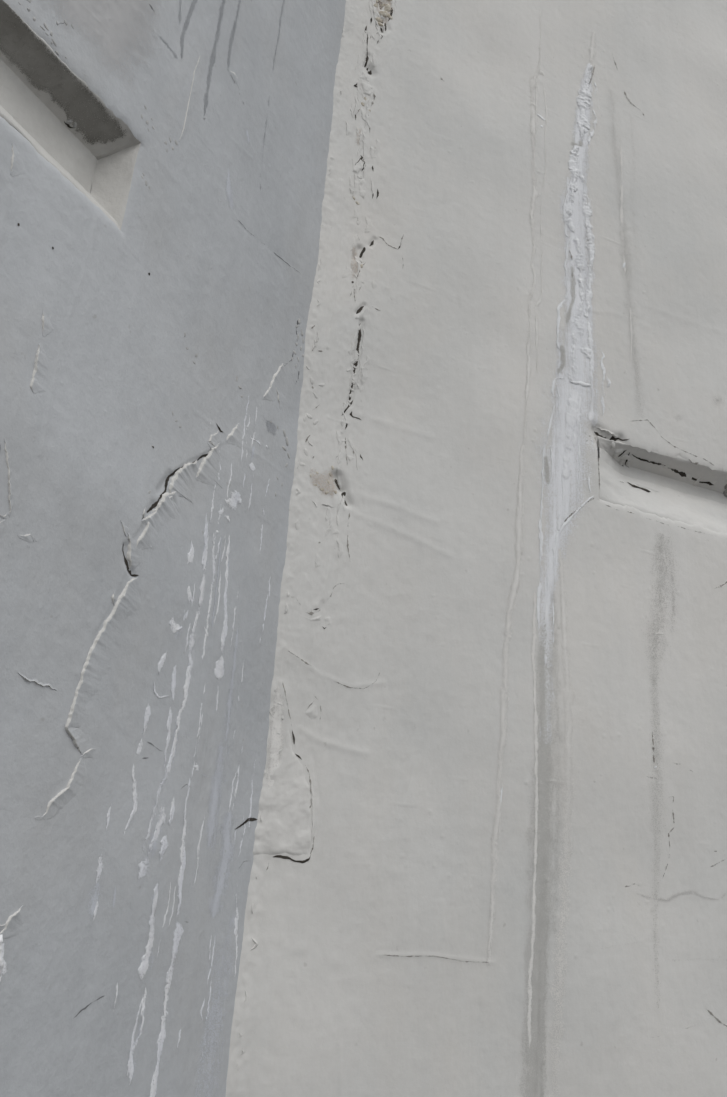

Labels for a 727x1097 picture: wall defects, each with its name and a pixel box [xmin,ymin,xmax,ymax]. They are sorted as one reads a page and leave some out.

peeling [342,0,398,296]
peeling [266,307,371,567]
crack [565,420,718,521]